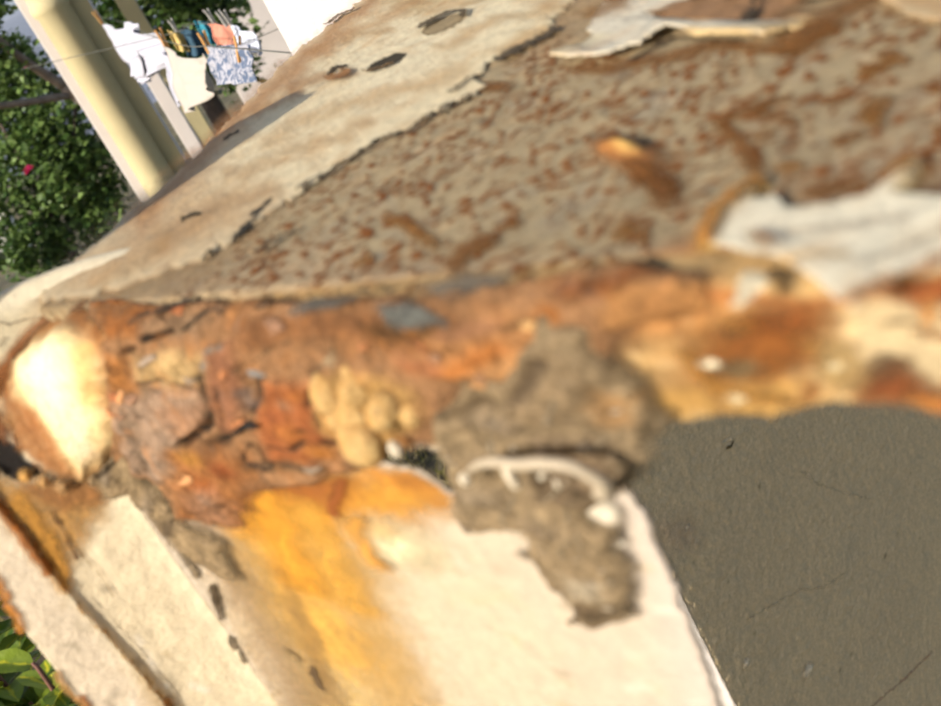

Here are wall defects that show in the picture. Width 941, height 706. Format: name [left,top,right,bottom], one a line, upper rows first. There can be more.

peeling [548,0,815,58]
peeling [880,0,941,23]
peeling [39,0,576,305]
rust [204,0,941,305]
peeling [696,155,941,310]
peeling [106,390,124,417]
peeling [458,471,472,486]
peeling [501,468,562,490]
peeling [585,501,623,548]
rust [232,467,454,706]